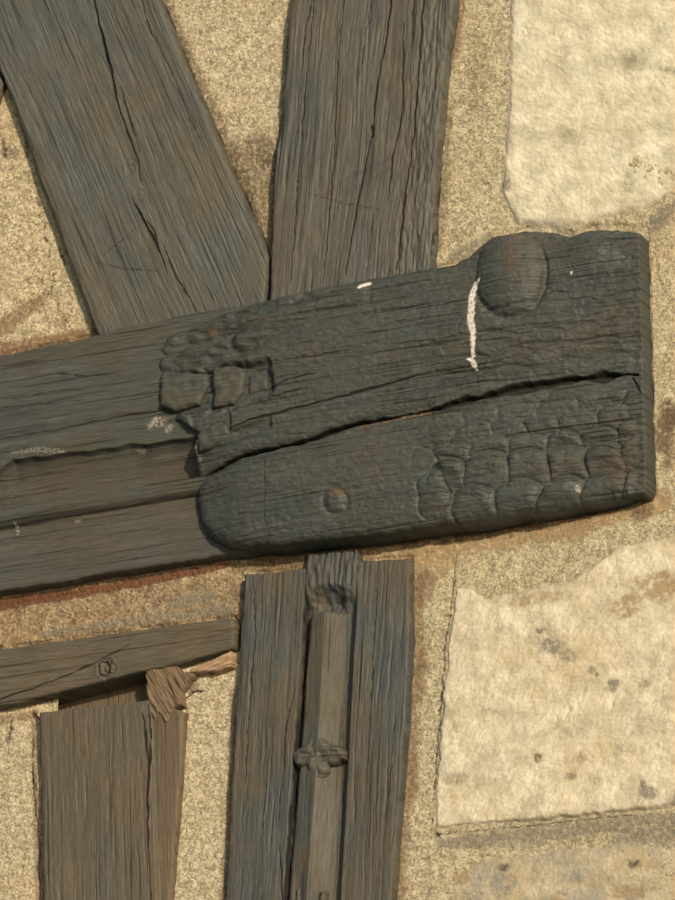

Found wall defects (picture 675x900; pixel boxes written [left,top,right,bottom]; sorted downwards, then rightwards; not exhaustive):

crack [93,0,213,311]
crack [323,0,425,279]
crack [210,374,645,534]
crack [0,648,124,700]
crack [434,582,455,790]
crack [32,739,41,900]
crack [142,704,152,900]